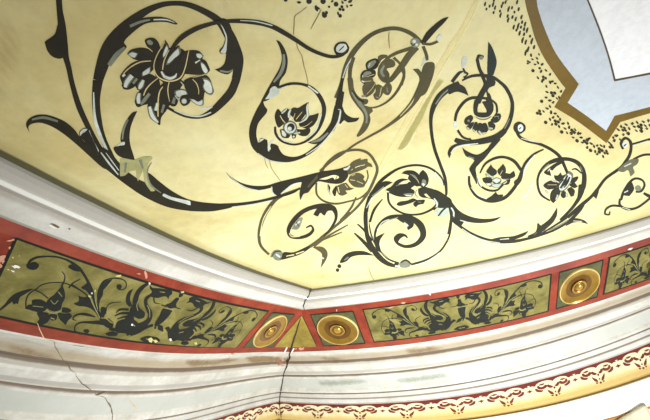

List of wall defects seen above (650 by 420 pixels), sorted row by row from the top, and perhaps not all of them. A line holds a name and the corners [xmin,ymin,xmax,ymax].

crack [37,323,113,420]
crack [279,290,312,415]